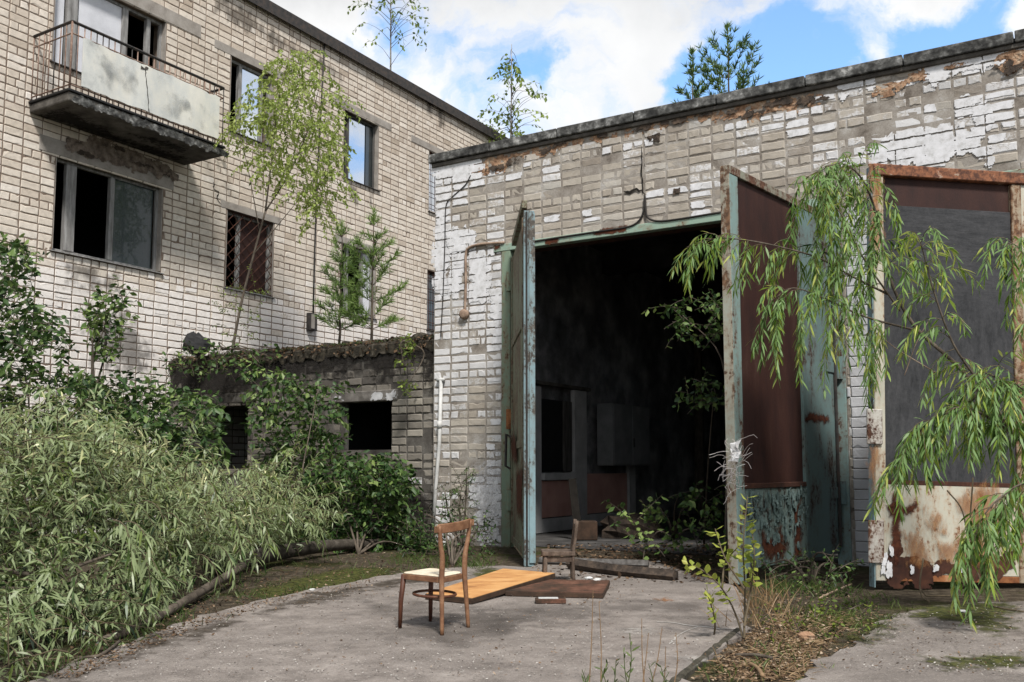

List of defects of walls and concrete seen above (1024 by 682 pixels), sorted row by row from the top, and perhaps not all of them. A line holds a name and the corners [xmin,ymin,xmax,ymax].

spalling [65,135,179,182]
peeling [431,49,1024,382]
rust [805,412,829,423]
rust [510,428,522,518]
rust [762,500,803,563]
rust [886,479,1000,566]